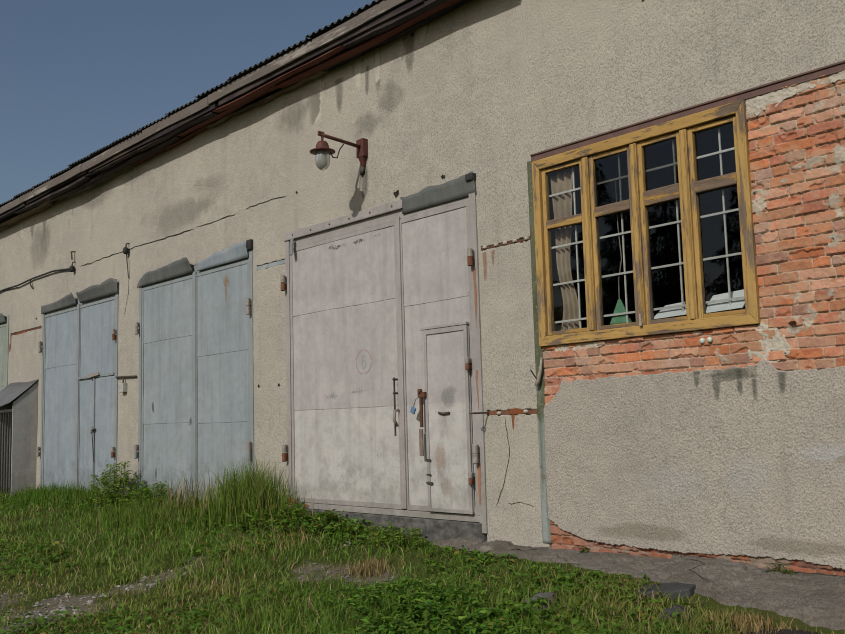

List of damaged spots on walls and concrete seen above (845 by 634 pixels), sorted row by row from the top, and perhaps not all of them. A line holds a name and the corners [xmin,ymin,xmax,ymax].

flaking render [481,70,845,415]
damp [721,369,756,394]
flaking render [550,520,845,576]